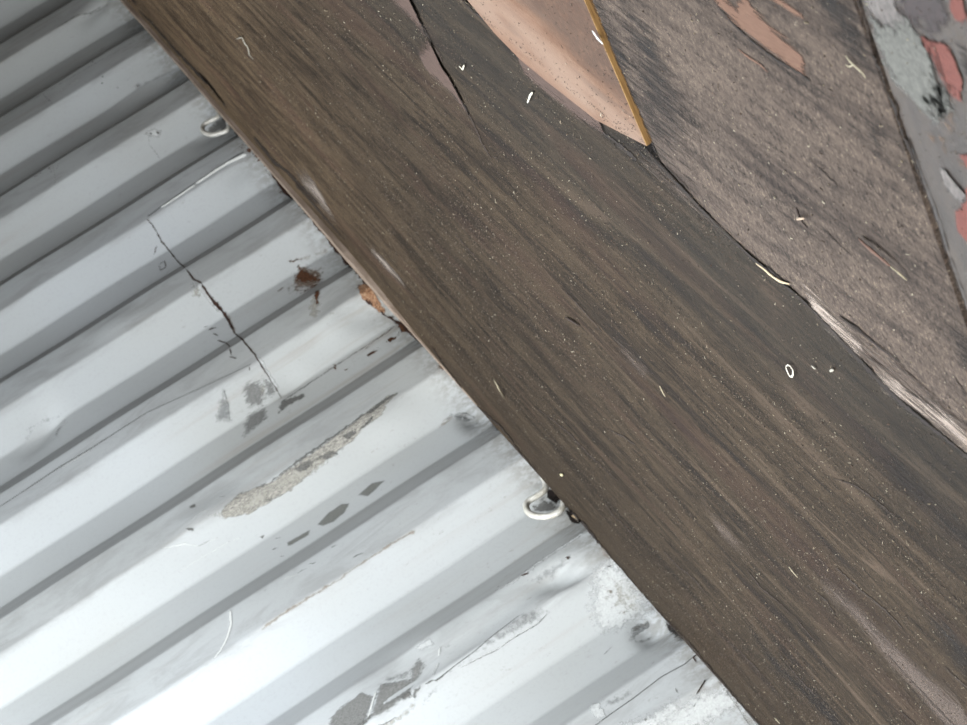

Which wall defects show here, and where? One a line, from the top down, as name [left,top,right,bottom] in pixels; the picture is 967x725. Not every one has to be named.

crack [394,0,498,159]
peeling [865,0,963,123]
peeling [948,0,966,23]
crack [147,219,281,397]
corrosion [278,258,323,316]
crack [461,0,967,459]
peeling [940,169,967,241]
peeling [221,393,397,518]
crack [432,348,537,473]
crack [565,506,760,725]